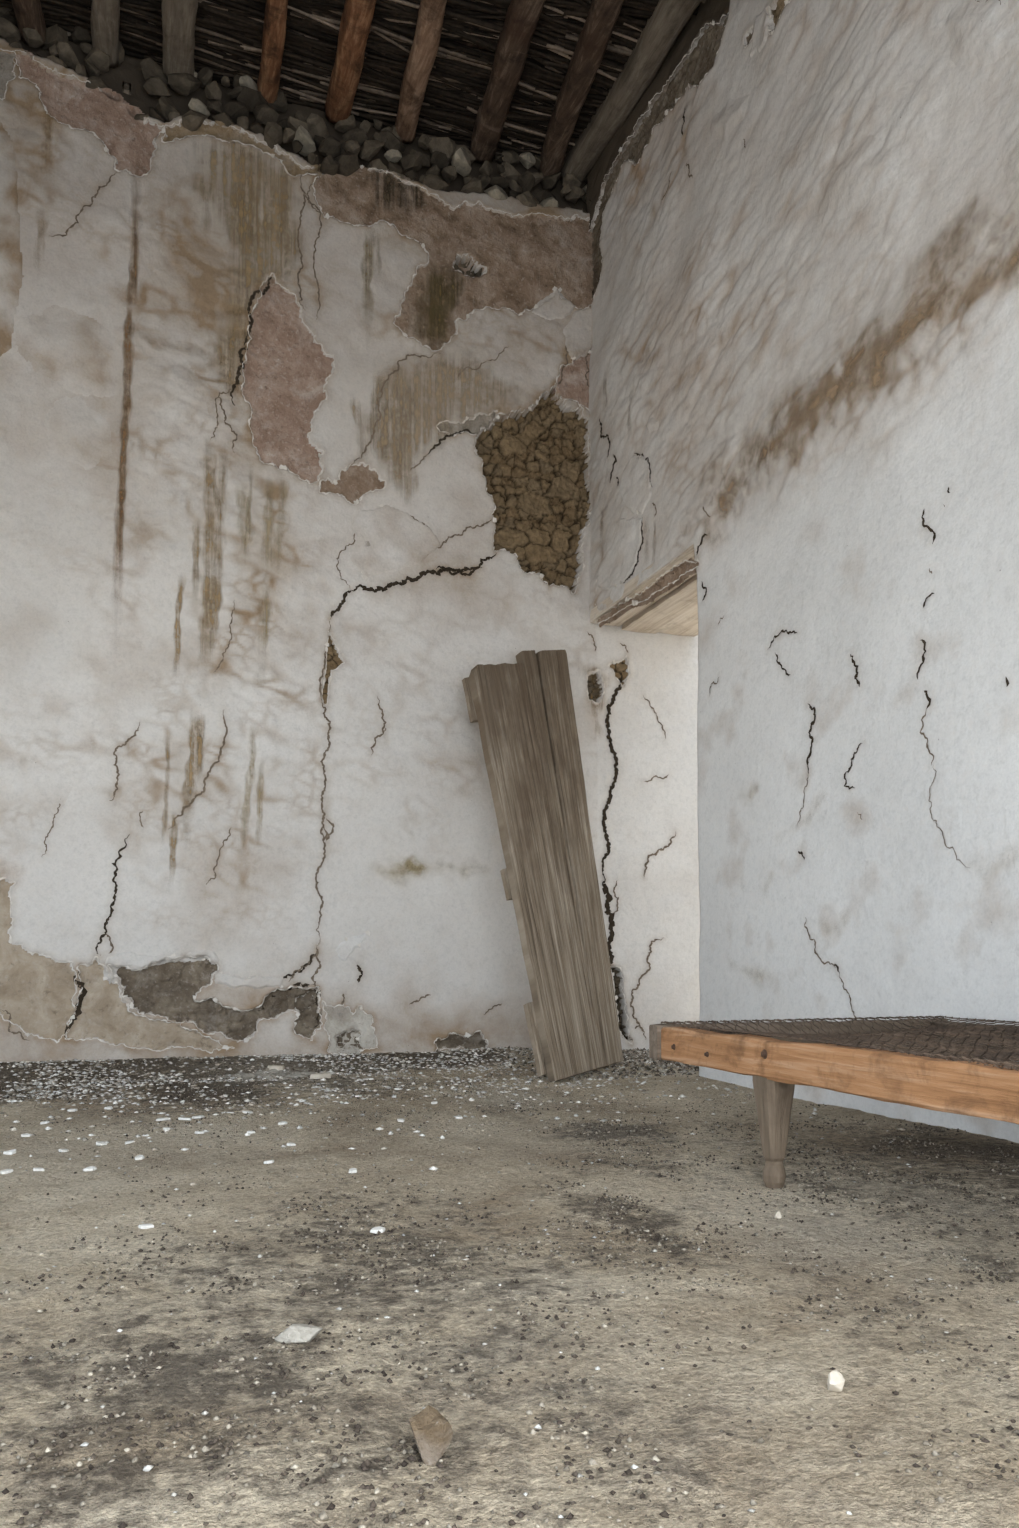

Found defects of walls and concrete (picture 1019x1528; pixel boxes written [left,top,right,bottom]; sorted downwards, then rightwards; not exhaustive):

spalling [743,0,791,48]
water stain [202,143,296,379]
spalling [0,12,729,627]
crack [64,710,228,1039]
water stain [165,812,177,863]
spalling [0,877,379,1055]
water stain [185,725,202,796]
water stain [175,459,225,660]
crack [259,515,496,1027]
crack [588,633,676,1041]
crack [768,630,861,860]
crack [916,487,968,868]